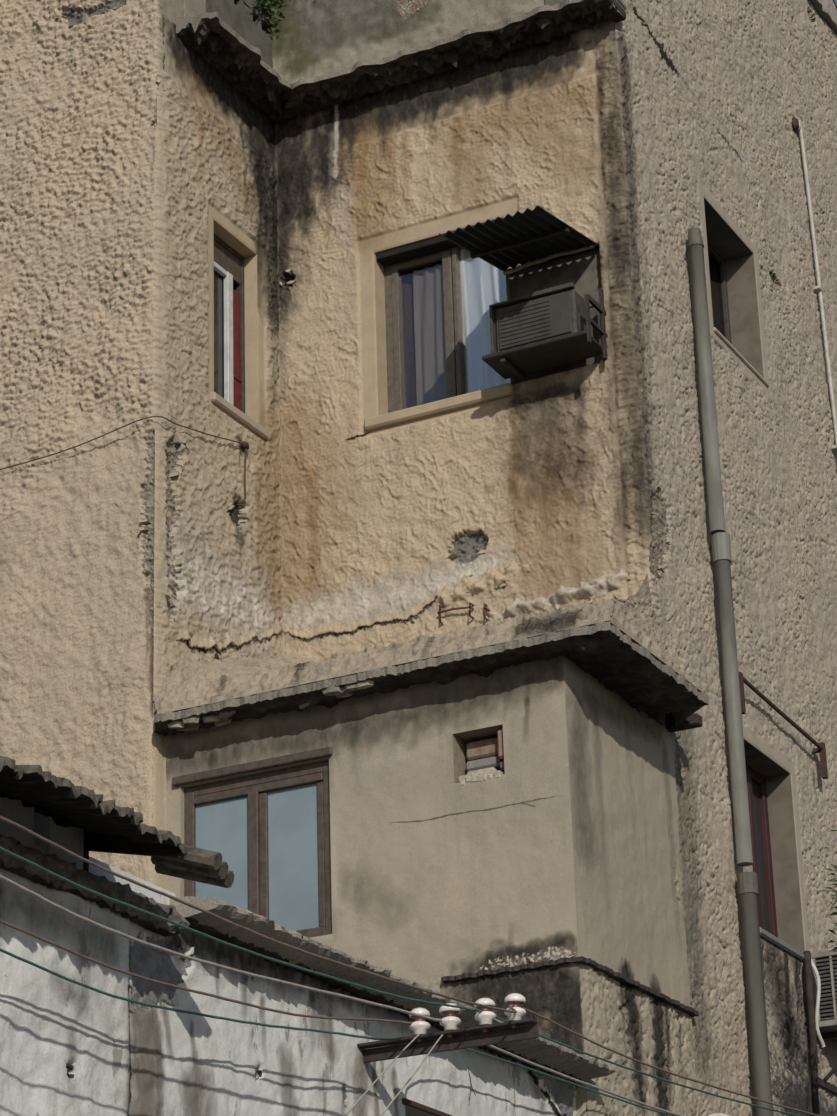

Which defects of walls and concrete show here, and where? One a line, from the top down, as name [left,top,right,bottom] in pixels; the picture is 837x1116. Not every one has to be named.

spalling [61,0,126,28]
damp [275,0,417,50]
crack [630,0,743,161]
damp [168,22,581,326]
damp [513,382,584,431]
crack [175,553,519,660]
peeling [436,527,532,625]
crack [391,795,559,823]
spalling [128,932,197,1011]
damp [128,998,168,1116]
damp [185,1071,209,1116]
damp [620,961,670,1116]